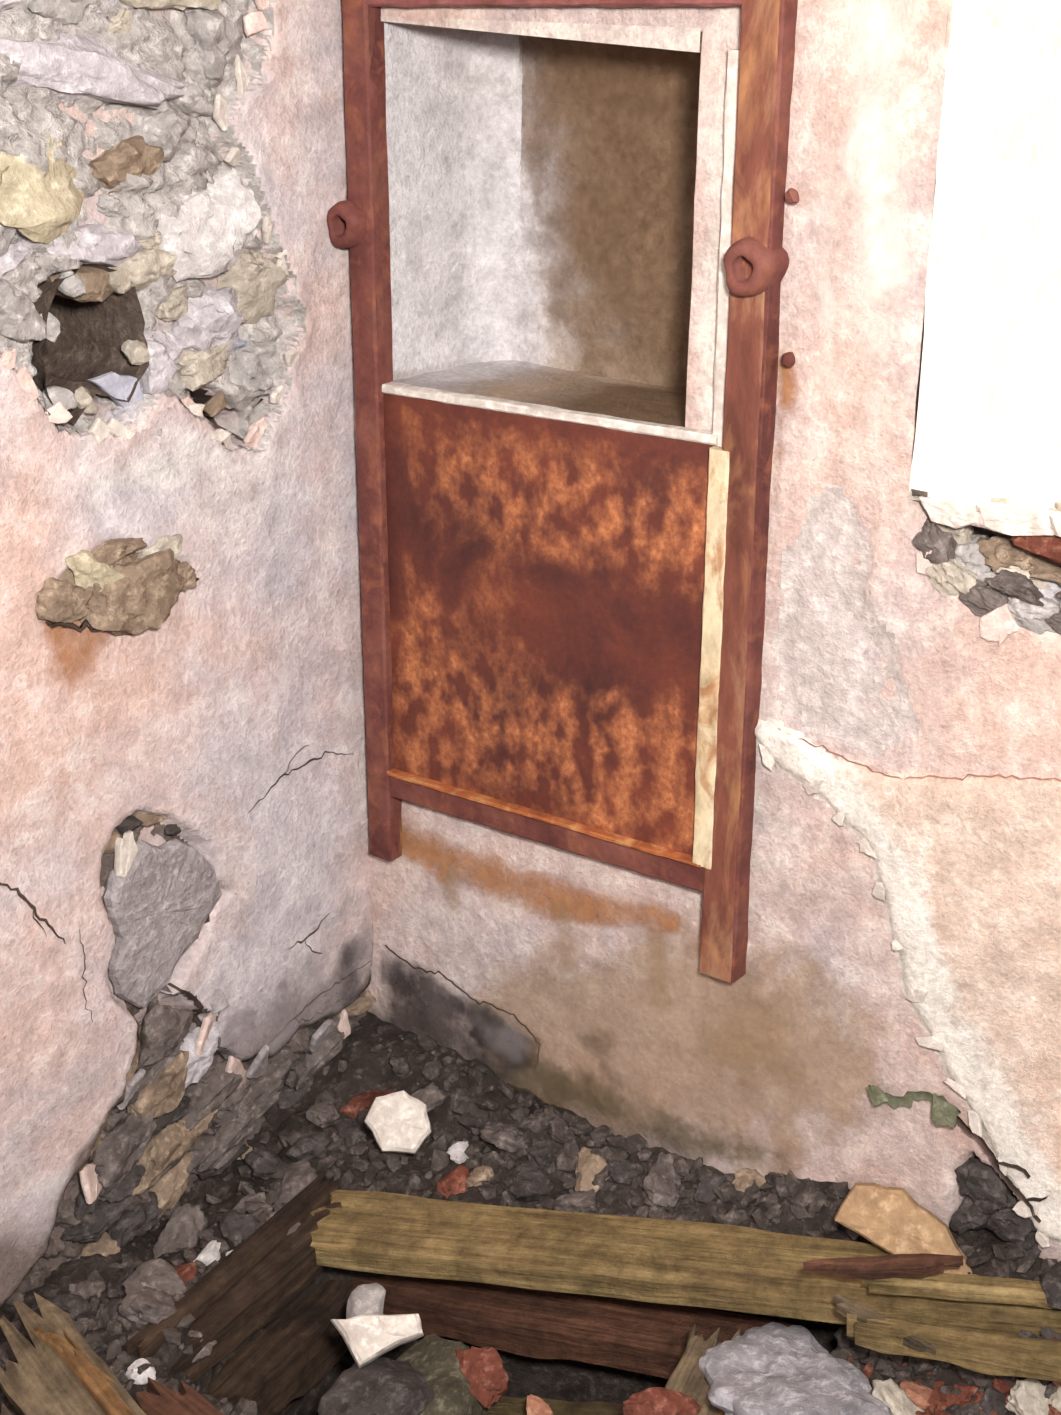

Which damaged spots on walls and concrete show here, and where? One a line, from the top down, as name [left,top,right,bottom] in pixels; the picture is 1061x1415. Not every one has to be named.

spalling [0,0,307,453]